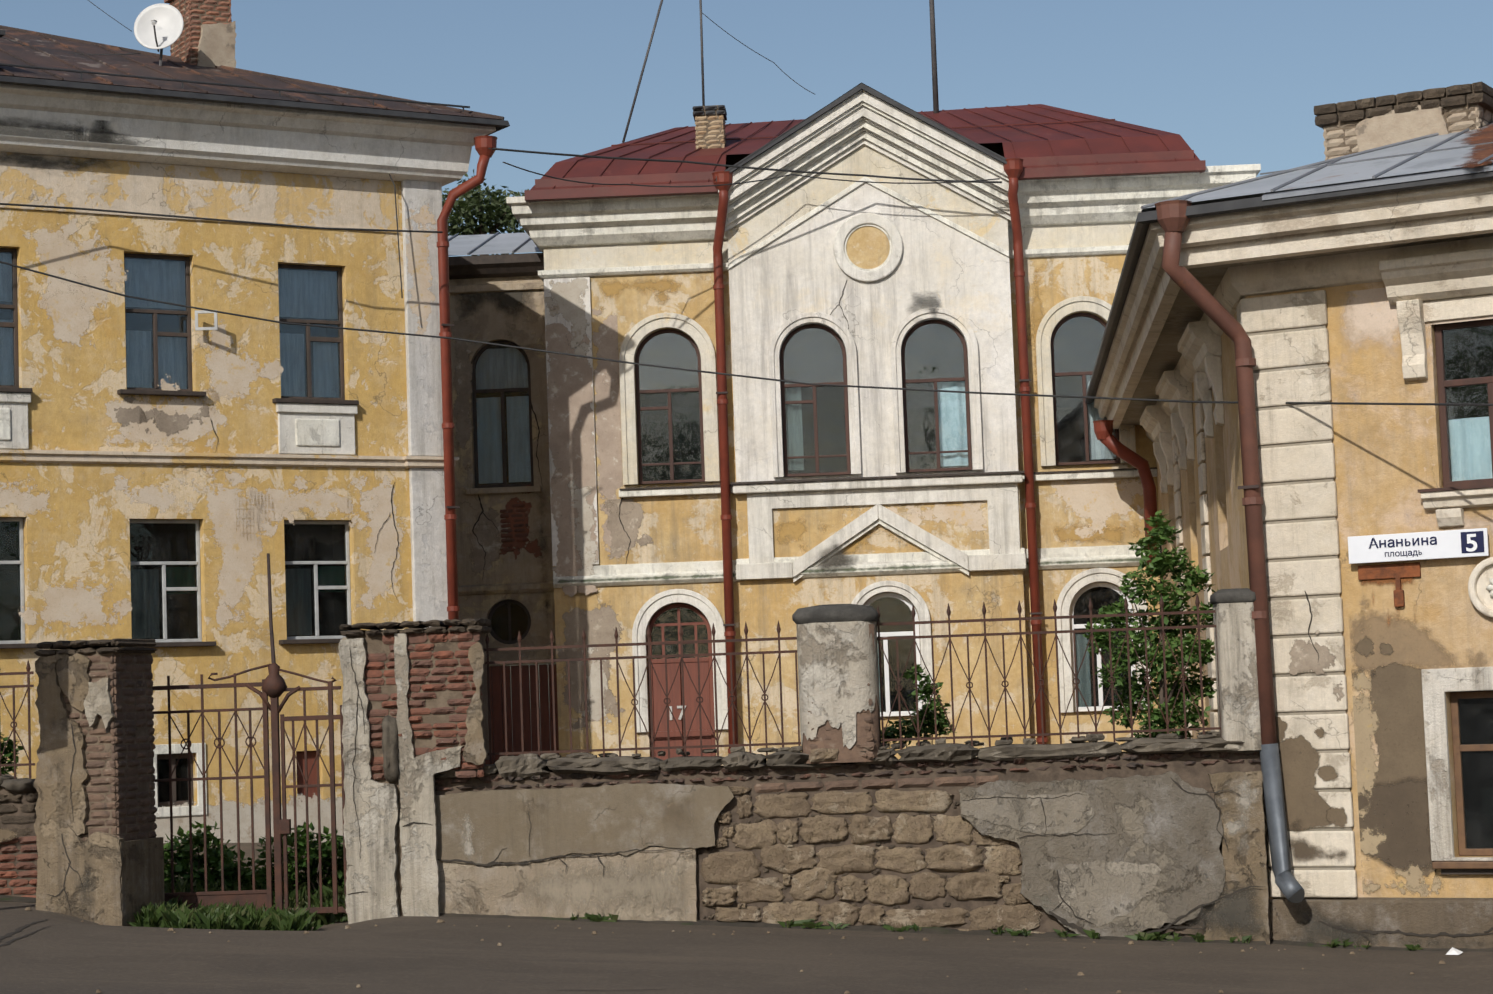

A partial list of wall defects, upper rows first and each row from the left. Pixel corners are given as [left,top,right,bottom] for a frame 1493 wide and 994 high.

damp [0,120,136,169]
peeling [22,218,128,350]
peeling [0,478,53,515]
peeling [18,580,133,629]
peeling [100,319,404,631]
crack [374,483,399,598]
peeling [500,278,654,730]
peeling [0,653,116,842]
peeling [338,633,488,924]
spalling [697,621,1071,934]
spalling [1275,630,1387,861]
peeling [1362,864,1441,897]